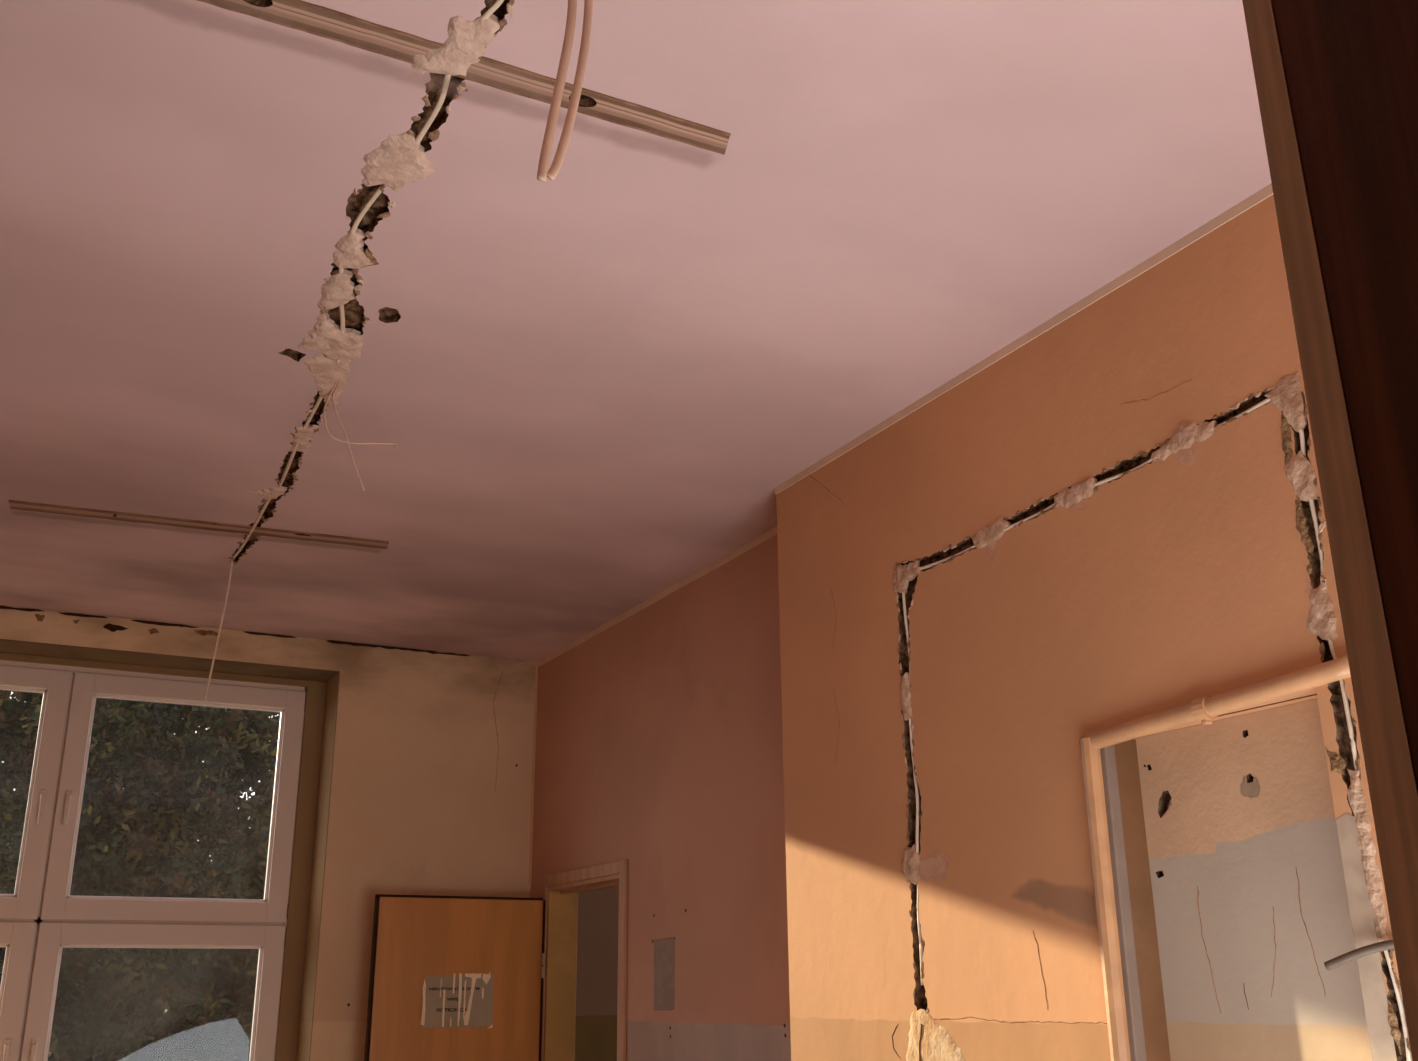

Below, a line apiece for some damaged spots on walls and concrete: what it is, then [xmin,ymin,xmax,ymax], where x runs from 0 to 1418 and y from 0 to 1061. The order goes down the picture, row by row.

spalling [493,0,515,37]
spalling [407,82,468,141]
spalling [345,184,396,295]
spalling [1196,386,1274,428]
spalling [1281,389,1311,465]
spalling [228,387,329,564]
spalling [1295,478,1327,588]
spalling [1241,777,1259,797]
spalling [1325,746,1363,792]
crack [1197,869,1326,1012]